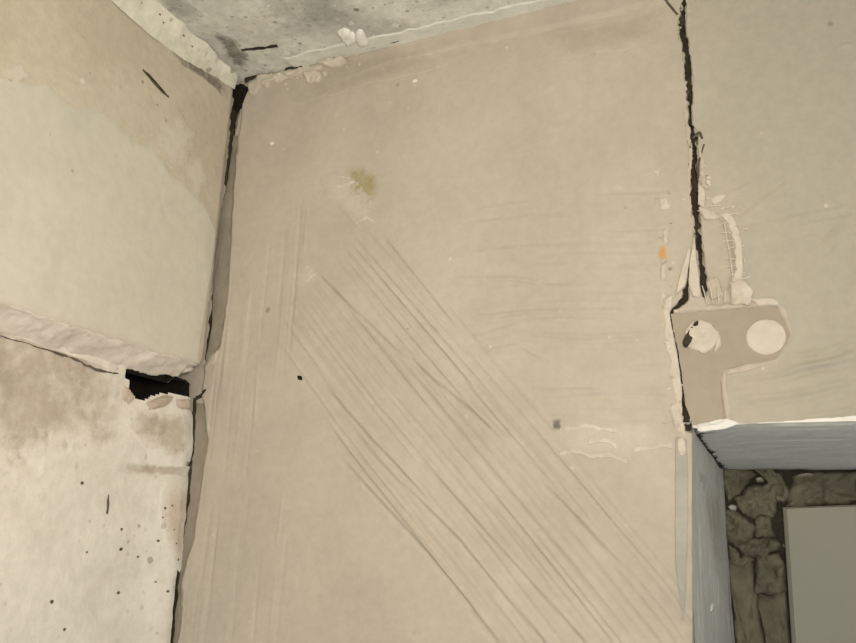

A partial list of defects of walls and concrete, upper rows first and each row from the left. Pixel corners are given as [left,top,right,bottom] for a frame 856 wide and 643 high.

peeling [0,63,239,373]
crack [221,83,249,211]
leakage [345,163,382,214]
crack [665,0,727,469]
crack [205,264,221,360]
leakage [0,332,193,573]
spalling [122,386,134,404]
crack [183,389,206,543]
crack [170,570,180,643]